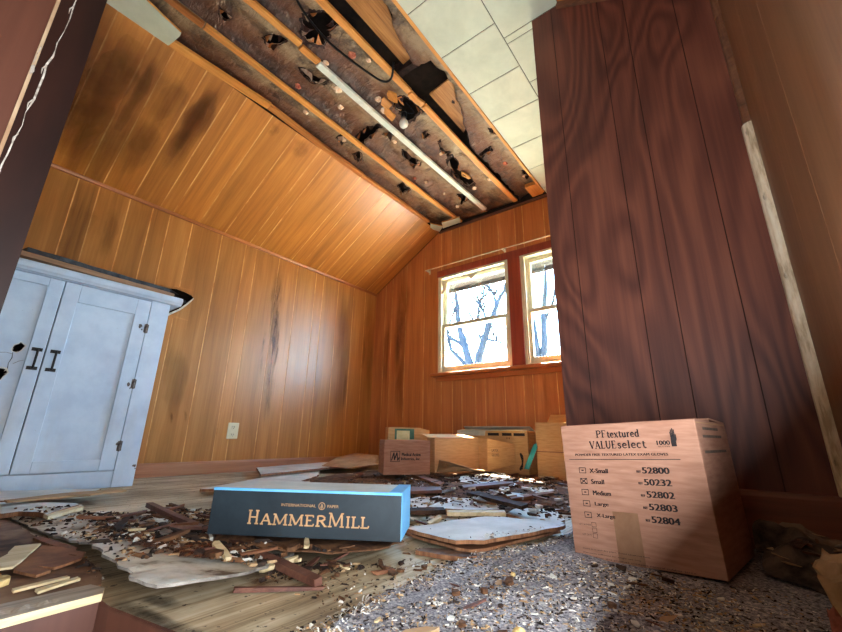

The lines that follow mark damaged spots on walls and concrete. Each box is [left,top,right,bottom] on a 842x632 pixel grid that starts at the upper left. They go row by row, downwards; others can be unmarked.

water stain [67,36,134,125]
water stain [181,99,211,144]